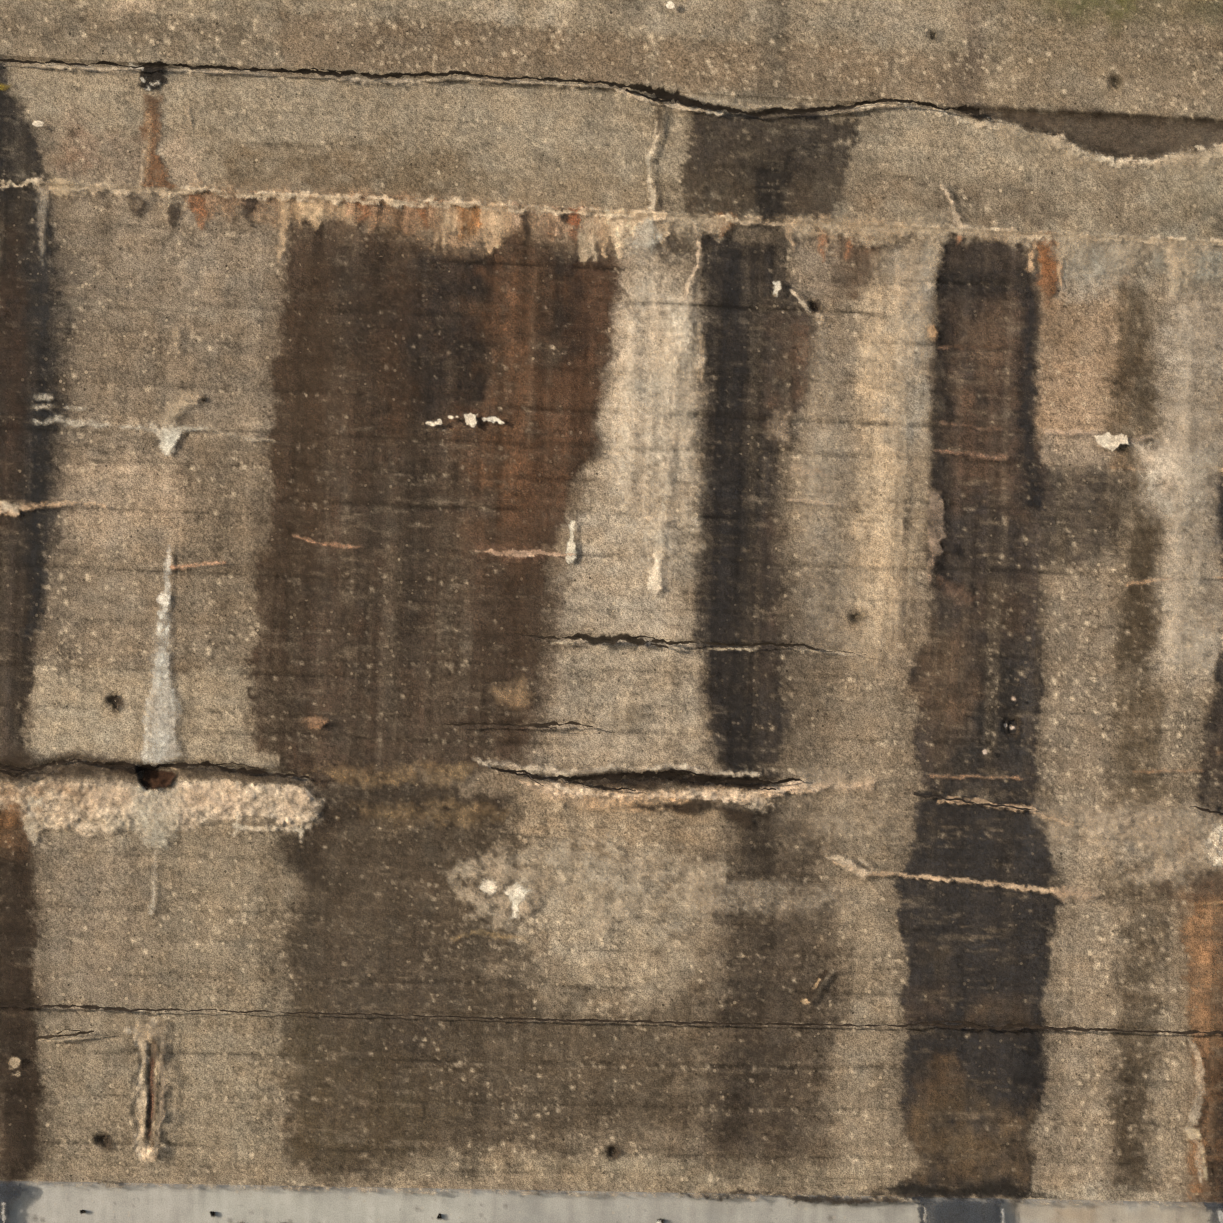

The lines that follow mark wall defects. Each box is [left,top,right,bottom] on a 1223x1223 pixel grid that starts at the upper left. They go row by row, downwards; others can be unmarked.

crack [0,59,980,117]
spalling [898,99,1223,172]
corrosion [129,95,669,262]
water stain [236,191,588,216]
corrosion [1028,232,1062,303]
water stain [0,63,226,764]
water stain [520,99,1223,1223]
water stain [0,218,624,1179]
crack [0,750,310,783]
crack [491,763,804,791]
corrosion [146,1058,155,1137]